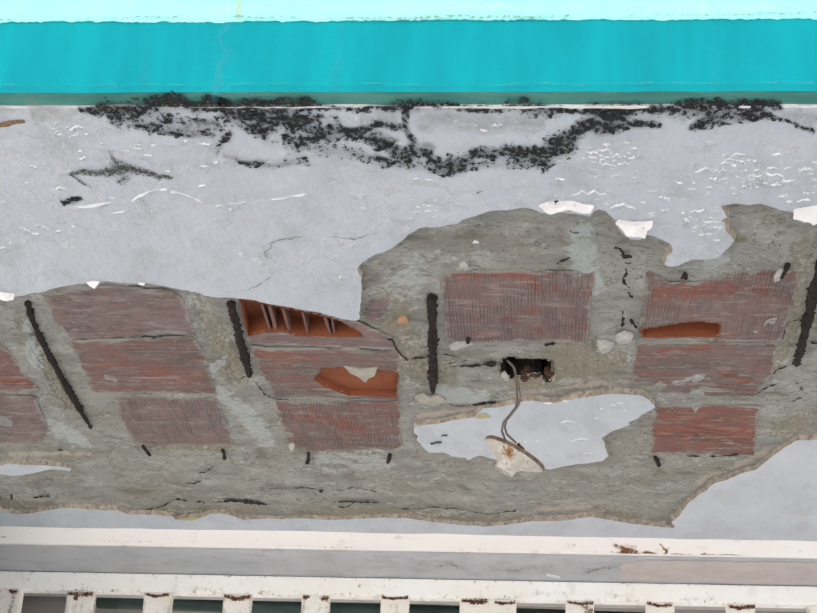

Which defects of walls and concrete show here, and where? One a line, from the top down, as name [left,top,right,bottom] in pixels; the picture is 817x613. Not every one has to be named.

damp [69,153,173,188]
damp [77,90,815,178]
flaking render [0,200,817,528]